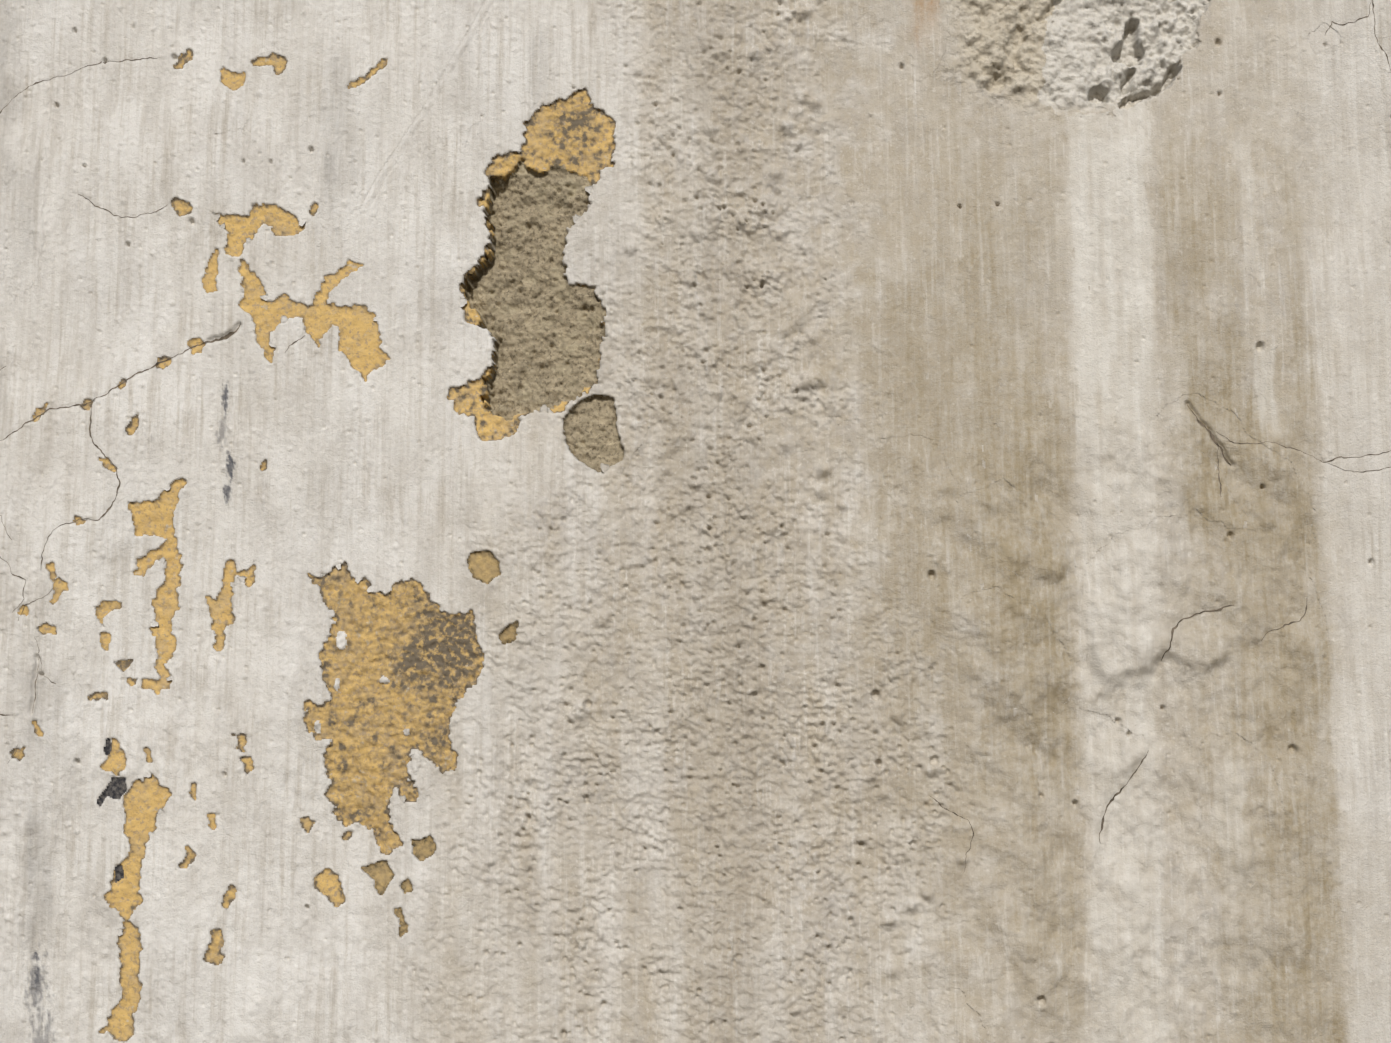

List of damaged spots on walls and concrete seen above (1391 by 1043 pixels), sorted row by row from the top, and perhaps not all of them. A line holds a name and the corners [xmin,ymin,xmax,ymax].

peeling [220,52,287,91]
spalling [933,0,1211,122]
crack [1325,0,1391,70]
peeling [202,203,390,382]
spalling [447,88,624,474]
crack [1187,405,1391,496]
peeling [95,478,187,695]
peeling [205,559,256,652]
peeling [499,621,519,645]
peeling [303,562,484,937]
peeling [99,738,172,1041]
peeling [178,846,196,868]